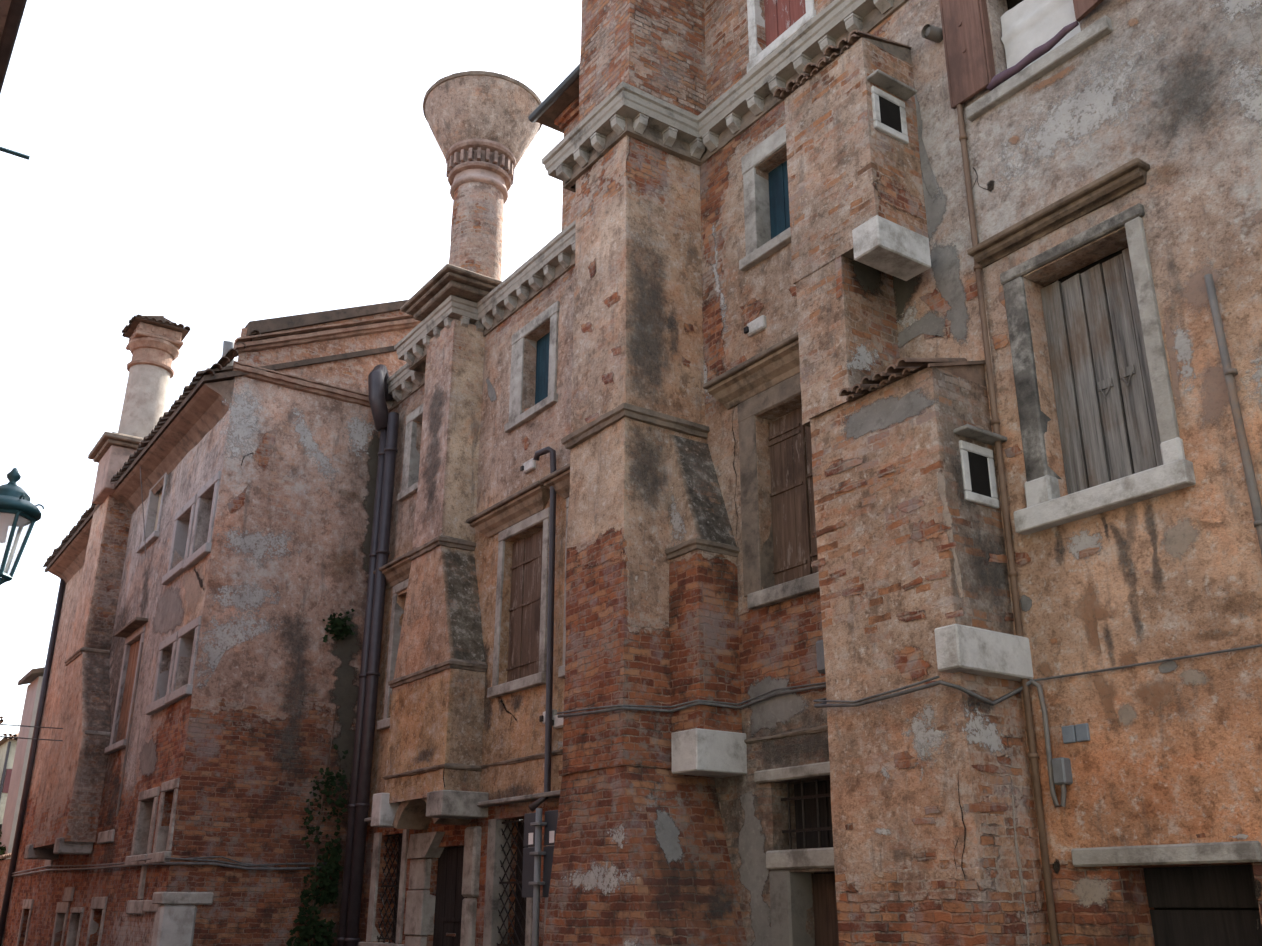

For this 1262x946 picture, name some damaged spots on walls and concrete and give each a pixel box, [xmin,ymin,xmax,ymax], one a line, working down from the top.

damp [1163,54,1215,136]
peeling [872,83,978,348]
flaking render [846,344,879,371]
damp [630,444,662,502]
flaking render [217,487,301,568]
damp [1101,517,1143,635]
damp [1146,505,1162,589]
flaking render [183,570,281,689]
spalling [881,704,944,781]
spalling [957,704,1008,774]
crack [954,773,966,879]